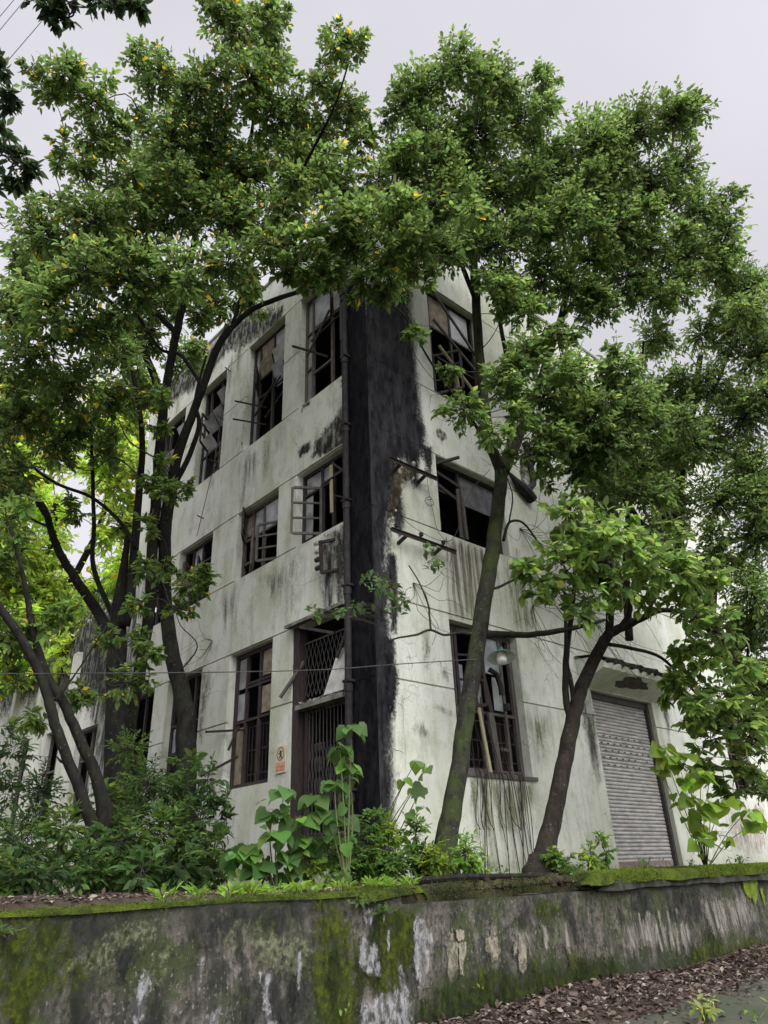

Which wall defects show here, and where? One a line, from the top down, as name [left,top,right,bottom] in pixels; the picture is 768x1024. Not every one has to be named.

water stain [170,305,283,407]
water stain [299,371,350,458]
water stain [390,429,446,536]
water stain [384,553,399,715]
water stain [133,970,163,1024]
water stain [193,900,314,1024]
efflorescence [359,909,390,976]
water stain [361,917,433,1024]
spalling [445,928,467,978]
spalling [484,923,527,975]